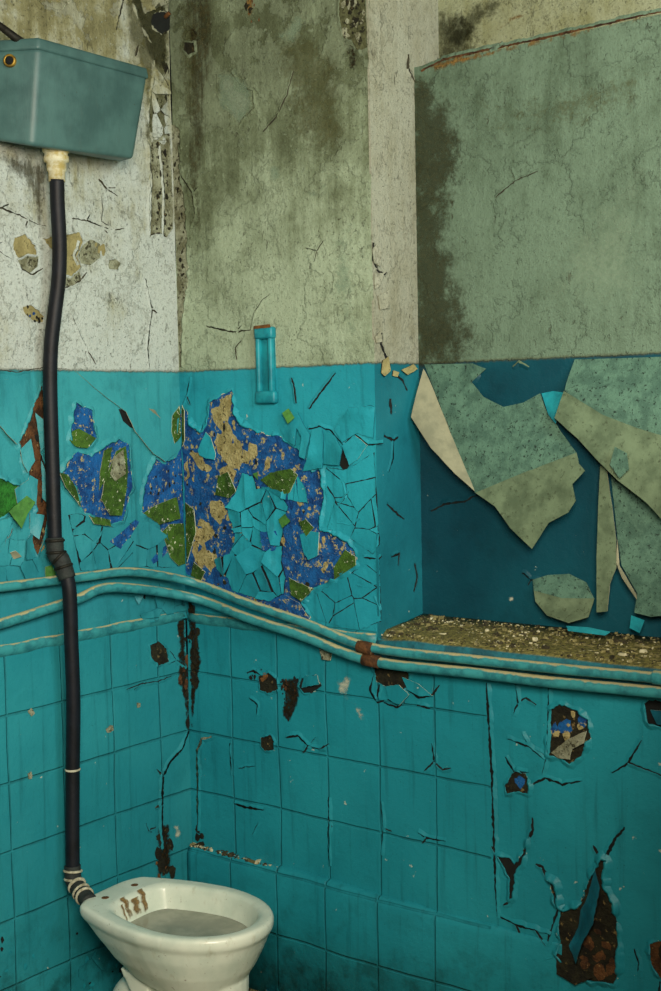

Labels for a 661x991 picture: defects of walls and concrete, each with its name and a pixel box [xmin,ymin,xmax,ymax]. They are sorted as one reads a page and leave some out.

water stain [189,0,210,186]
spalling [13,232,52,279]
water stain [414,80,471,367]
spalling [21,304,45,324]
peeling [60,0,383,632]
peeling [0,379,56,582]
spalling [246,667,280,716]
peeling [297,674,322,696]
spalling [259,733,277,754]
peeling [503,700,594,798]
peeling [490,817,625,989]
peeling [644,937,661,991]